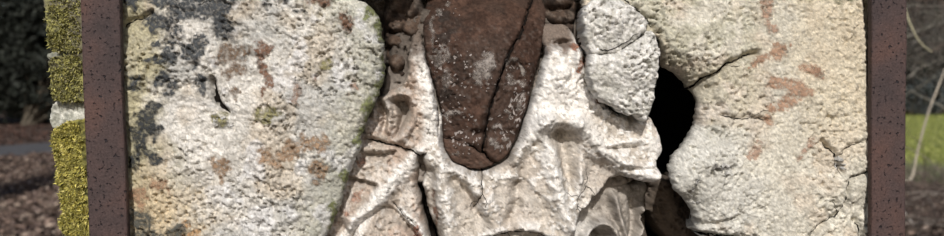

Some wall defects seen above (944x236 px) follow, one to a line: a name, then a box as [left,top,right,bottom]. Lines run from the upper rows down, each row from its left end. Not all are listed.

crack [443,0,533,208]
crack [674,53,752,90]
crack [691,228,733,236]
crack [810,142,866,236]